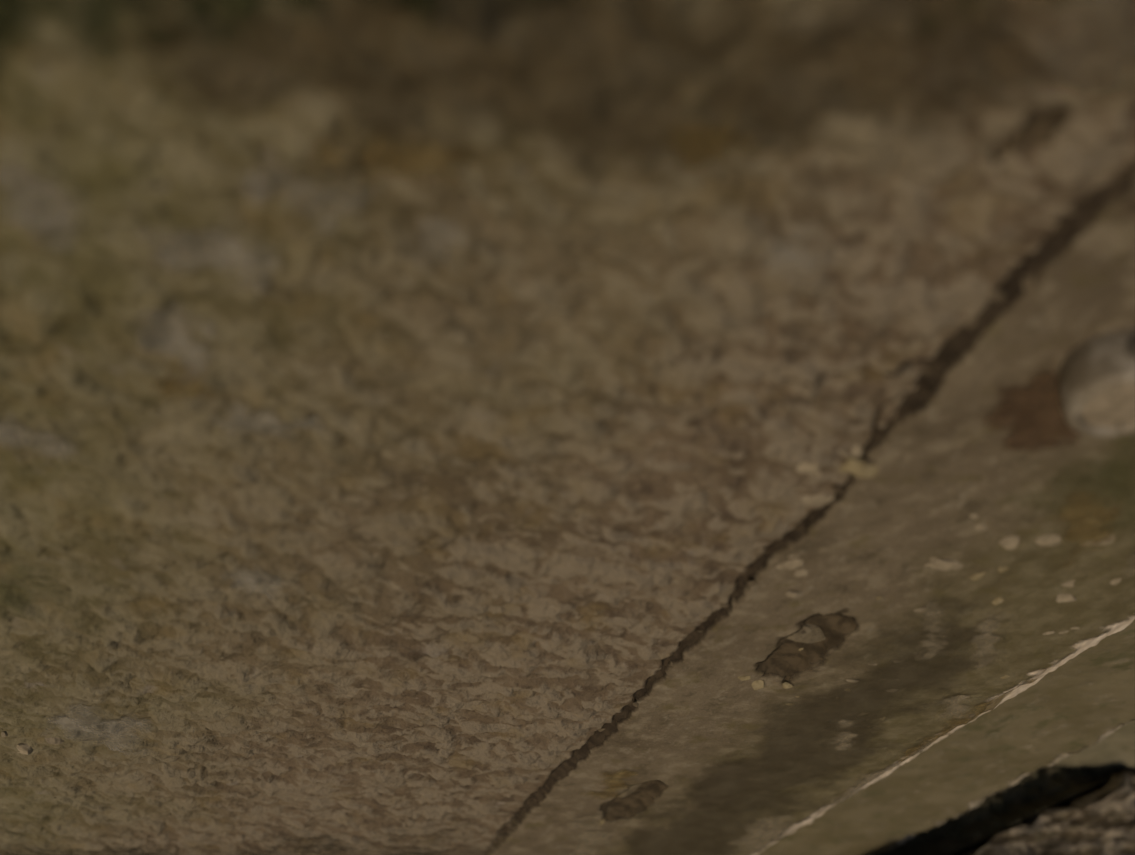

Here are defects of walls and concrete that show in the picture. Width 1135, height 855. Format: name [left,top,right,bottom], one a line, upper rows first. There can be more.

crack [490,163,1135,852]
spalling [998,536,1020,550]
spalling [1035,533,1062,546]
spalling [924,557,1009,580]
spalling [1056,580,1077,603]
spalling [738,610,859,705]
spalling [751,616,1135,855]
spalling [599,780,667,824]